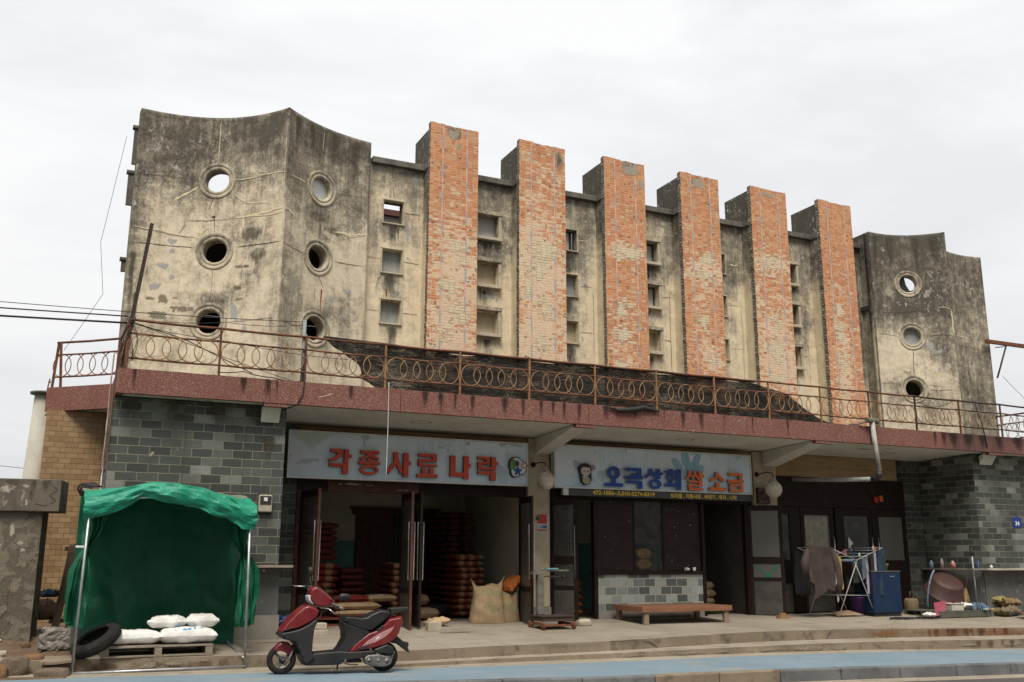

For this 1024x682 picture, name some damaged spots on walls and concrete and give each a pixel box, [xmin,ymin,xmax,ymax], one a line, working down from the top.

peeling [145,238,193,319]
water stain [236,227,266,268]
crack [136,124,419,327]
peeling [1,482,29,506]
peeling [0,523,27,592]